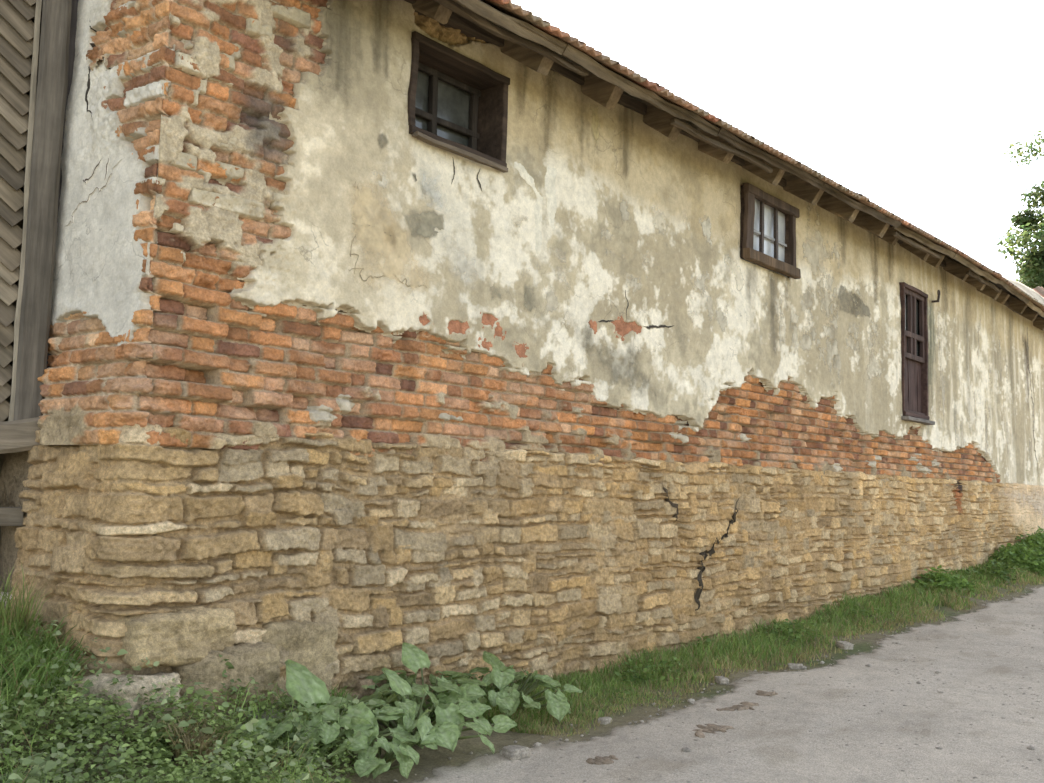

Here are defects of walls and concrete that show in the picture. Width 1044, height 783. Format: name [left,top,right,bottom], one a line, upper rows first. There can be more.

crack [66,155,122,226]
flaking render [37,0,1000,486]
crack [598,290,674,330]
crack [662,484,679,523]
crack [694,498,739,611]